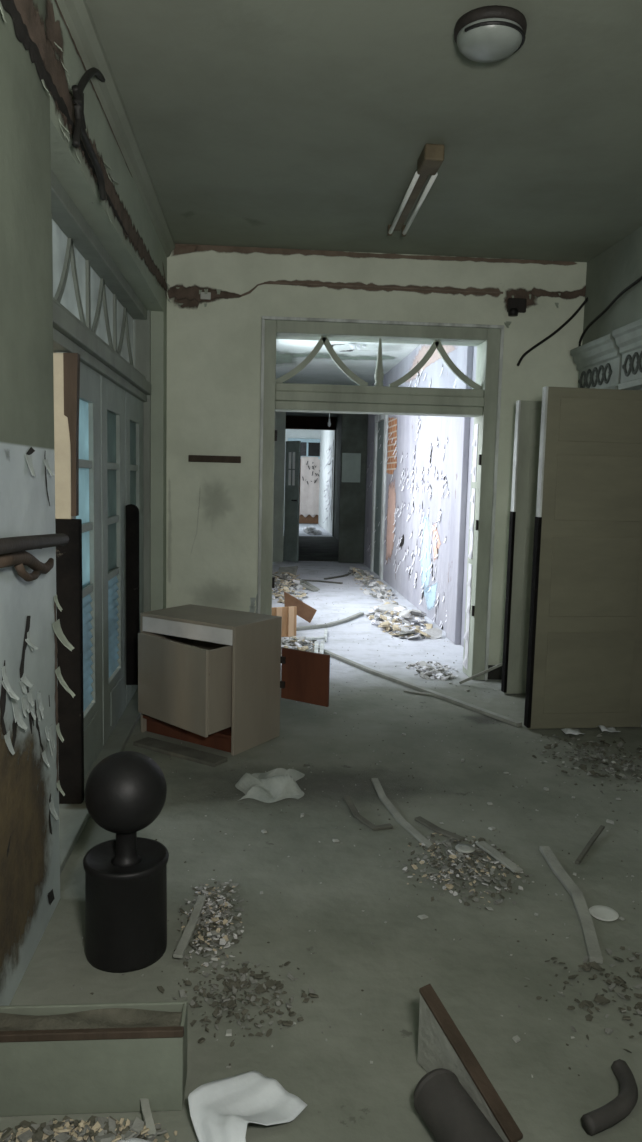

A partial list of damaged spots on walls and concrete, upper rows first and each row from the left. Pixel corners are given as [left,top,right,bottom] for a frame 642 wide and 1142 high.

spalling [0,0,586,328]
peeling [366,418,449,609]
peeling [463,424,479,670]
peeling [0,595,75,984]